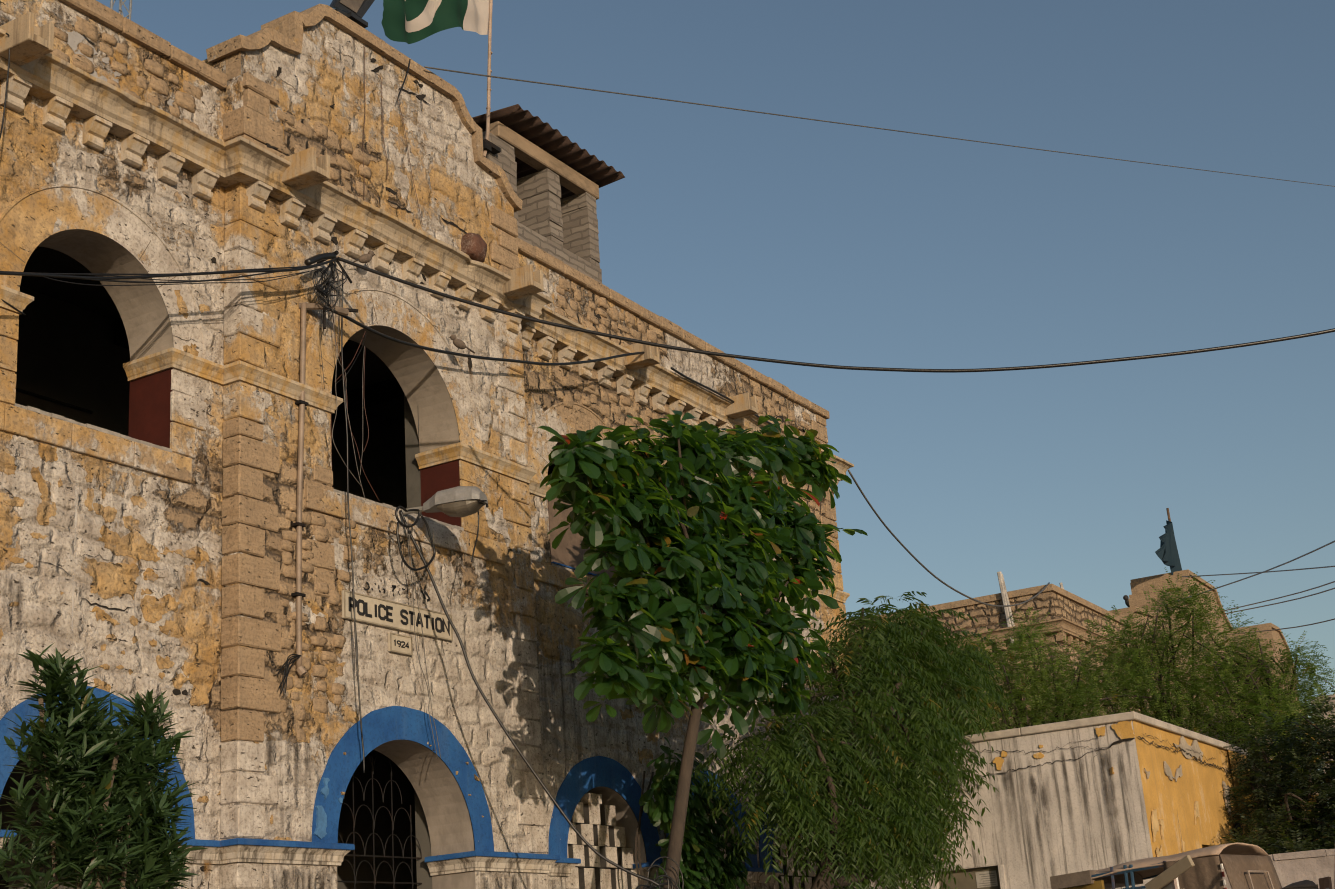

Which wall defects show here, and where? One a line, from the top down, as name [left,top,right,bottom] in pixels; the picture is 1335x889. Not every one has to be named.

peeling [74,46,122,83]
peeling [271,60,309,96]
spalling [282,109,344,178]
peeling [343,81,454,209]
peeling [0,435,63,569]
peeling [311,535,357,570]
peeling [78,463,217,707]
peeling [289,598,330,625]
peeling [1095,720,1135,739]
peeling [1144,736,1203,782]